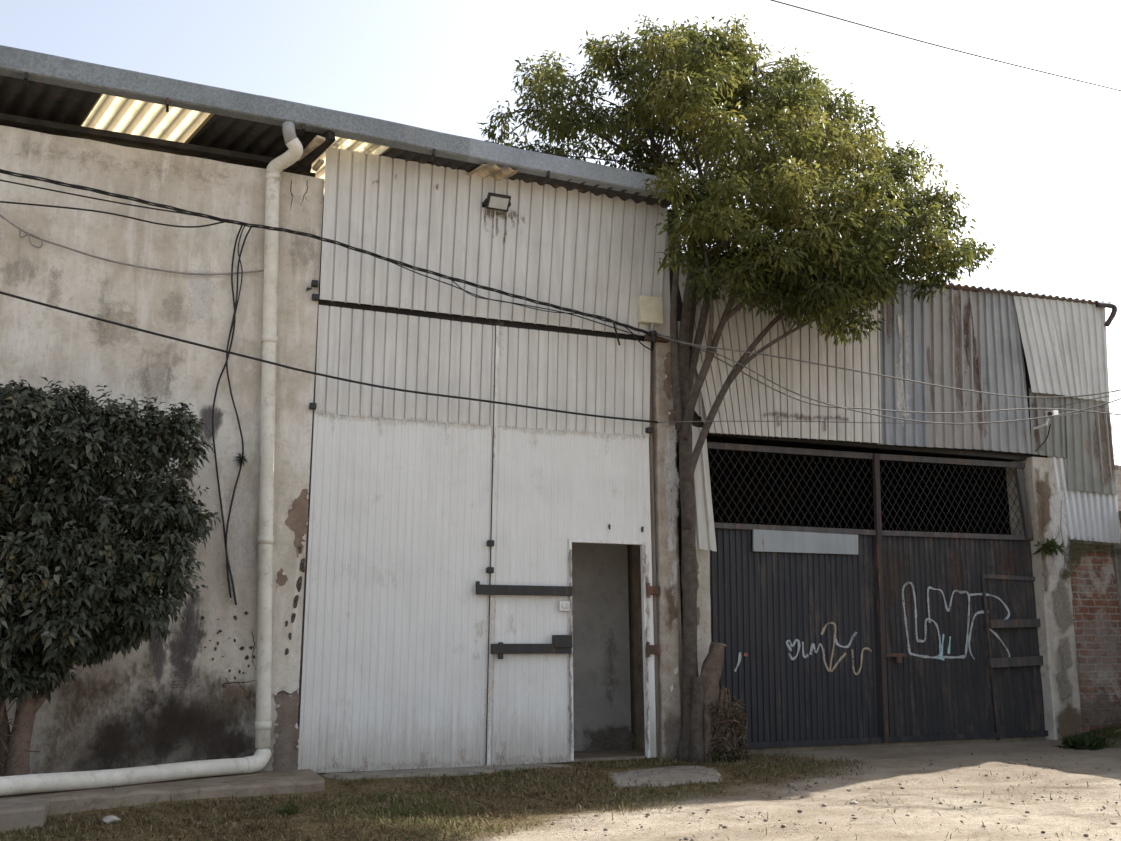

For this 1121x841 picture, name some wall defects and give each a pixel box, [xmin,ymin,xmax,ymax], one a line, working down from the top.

rust [964,298,986,400]
peeling [273,489,309,655]
damp [48,669,136,760]
damp [78,596,256,770]
spalling [272,688,300,771]